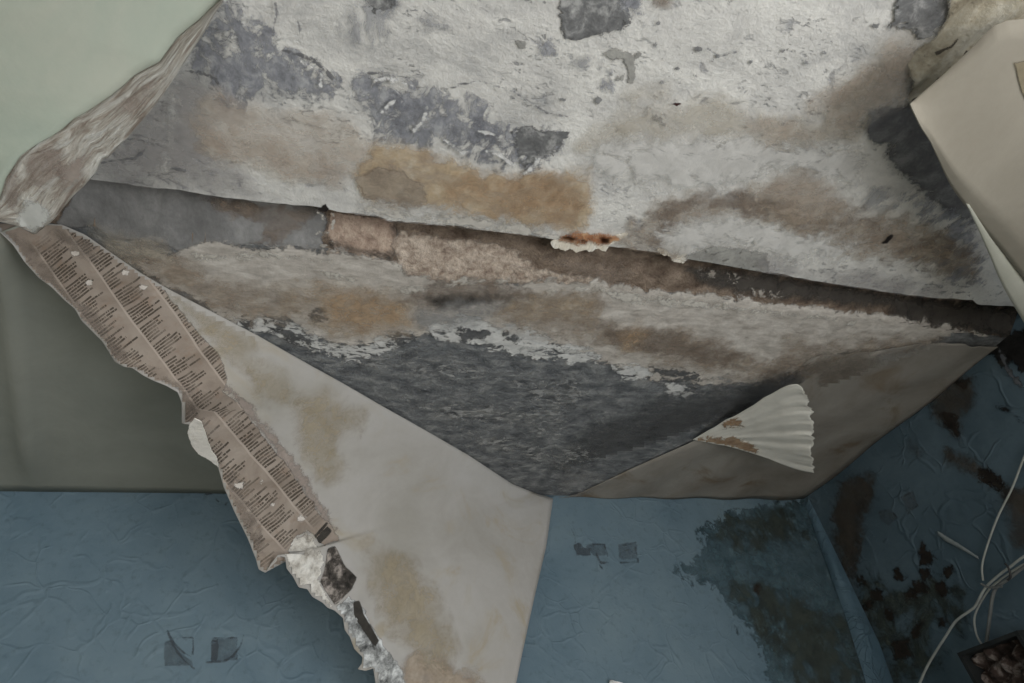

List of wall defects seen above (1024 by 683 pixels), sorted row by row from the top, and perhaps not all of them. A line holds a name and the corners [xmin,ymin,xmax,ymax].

peeling [189,0,569,175]
flaking render [515,0,641,57]
peeling [594,48,642,104]
water stain [355,146,592,231]
water stain [619,44,986,286]
rust [550,231,628,253]
water stain [109,242,1018,480]
peeling [188,418,218,467]
water stain [944,446,1024,546]
water stain [673,499,866,683]
water stain [831,473,971,683]